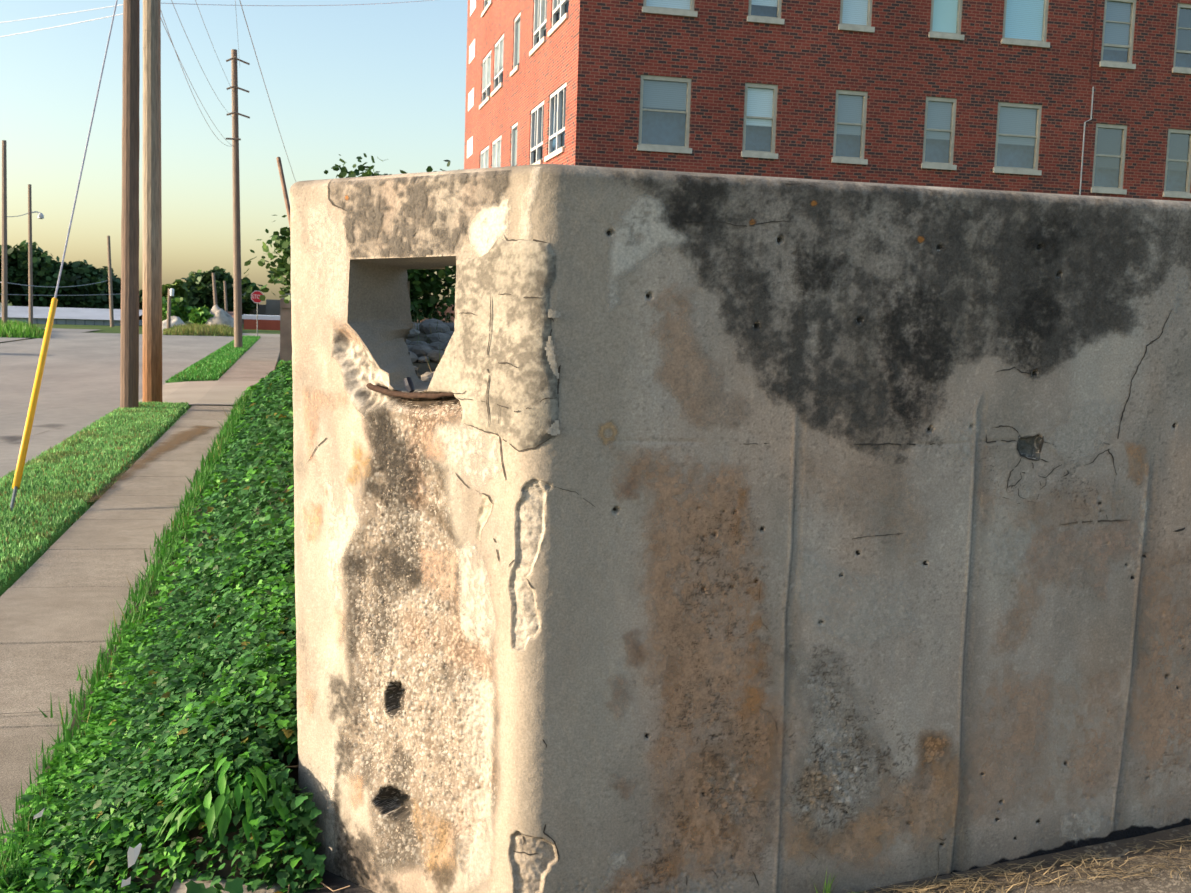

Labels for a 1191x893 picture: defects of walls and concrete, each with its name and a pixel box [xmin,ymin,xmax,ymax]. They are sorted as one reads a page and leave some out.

leakage [310,170,510,315]
leakage [521,167,540,239]
leakage [608,175,1191,460]
crack [986,310,1172,525]
spalling [332,325,497,874]
spalling [509,480,555,651]
spalling [509,831,558,893]